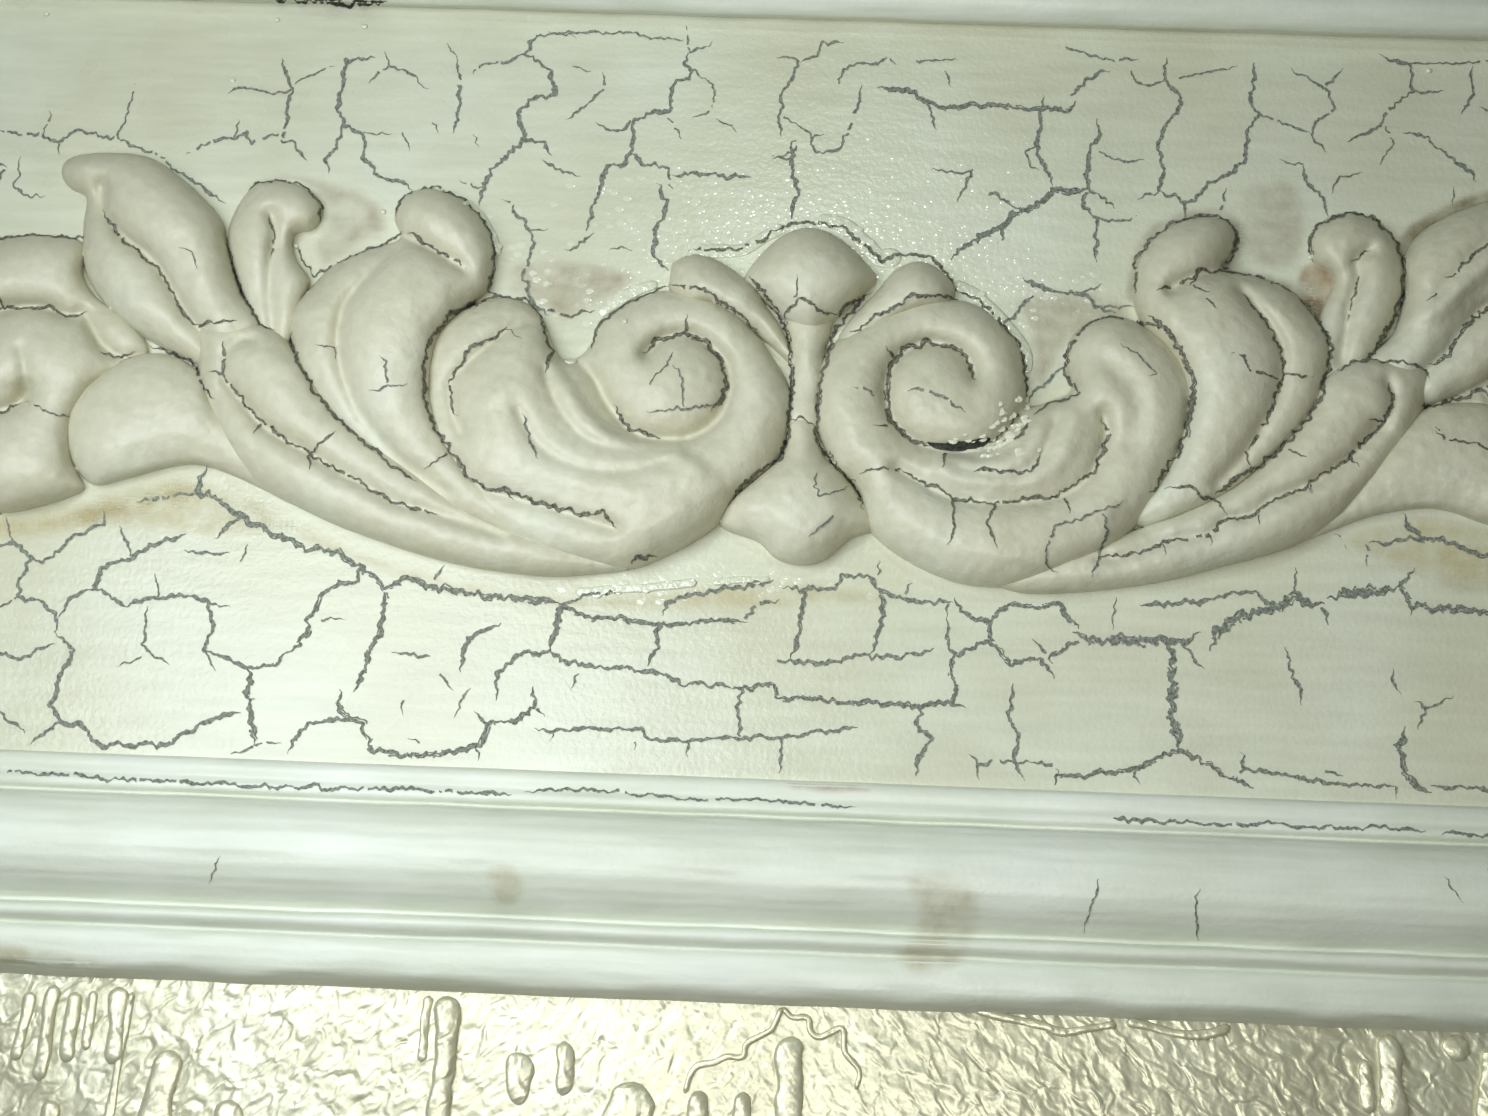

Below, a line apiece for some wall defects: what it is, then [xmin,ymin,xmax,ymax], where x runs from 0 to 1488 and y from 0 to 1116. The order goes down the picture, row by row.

crack [0,26,1488,838]
crack [1084,880,1099,929]
crack [1192,892,1200,941]